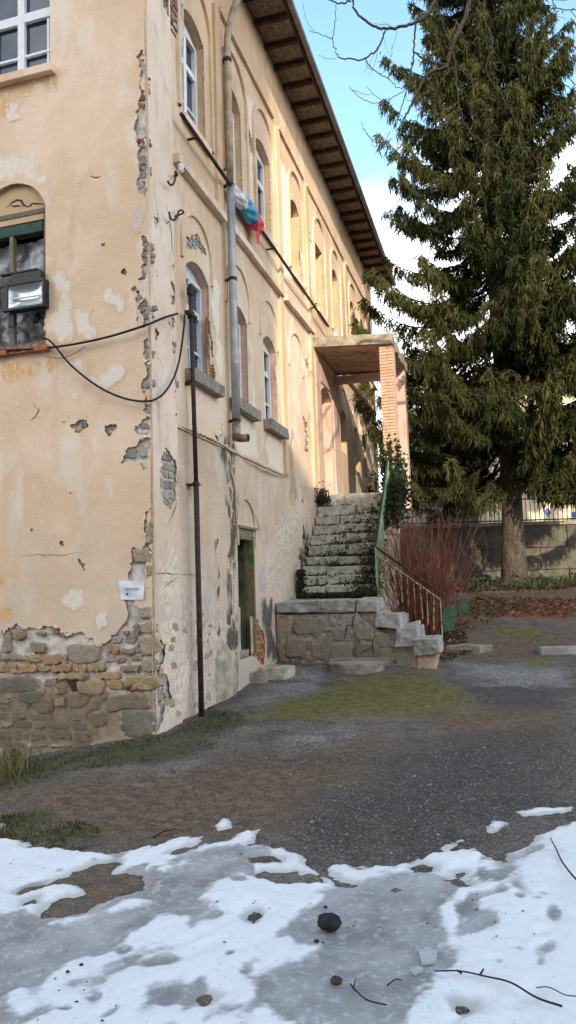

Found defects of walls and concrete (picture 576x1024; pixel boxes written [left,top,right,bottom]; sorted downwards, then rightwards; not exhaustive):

crack [6,199,42,208]
peeling [43,51,285,508]
flaking render [0,511,227,759]
water stain [215,430,241,692]
flaking render [250,616,268,665]